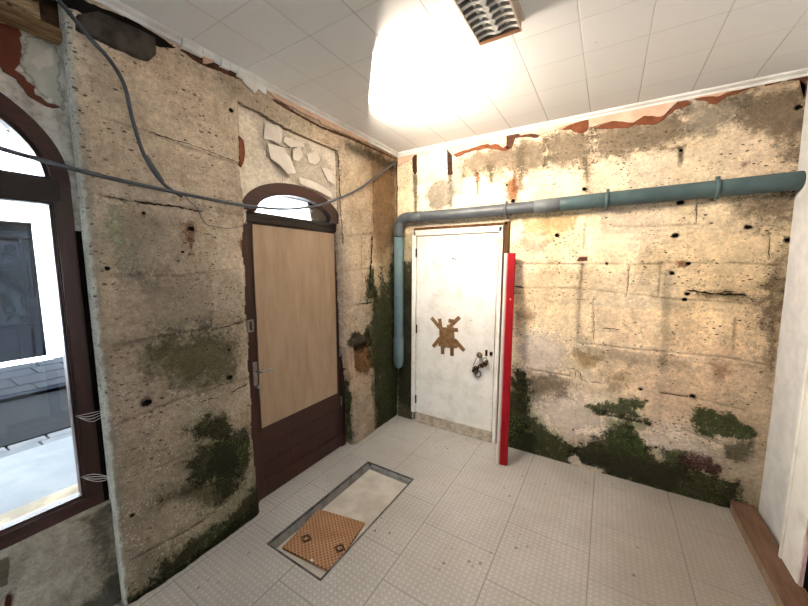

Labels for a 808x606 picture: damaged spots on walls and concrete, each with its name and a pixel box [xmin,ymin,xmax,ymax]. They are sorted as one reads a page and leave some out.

peeling [0,23,65,110]
spalling [52,0,414,167]
peeling [264,122,335,199]
peeling [447,76,808,158]
damp [448,80,808,190]
damp [736,191,795,234]
crack [687,289,747,297]
damp [530,394,729,479]